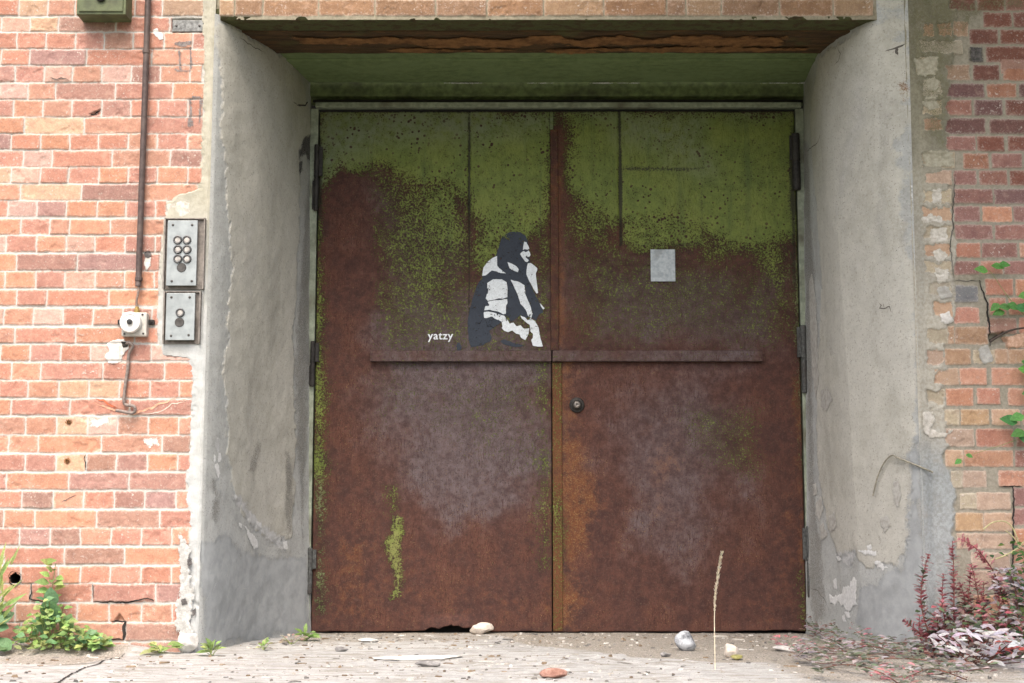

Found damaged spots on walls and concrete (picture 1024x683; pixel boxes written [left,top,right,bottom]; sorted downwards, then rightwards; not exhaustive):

crack [949,171,1001,346]
crack [92,585,154,641]
flaking render [174,535,196,634]
peeling [829,544,888,622]